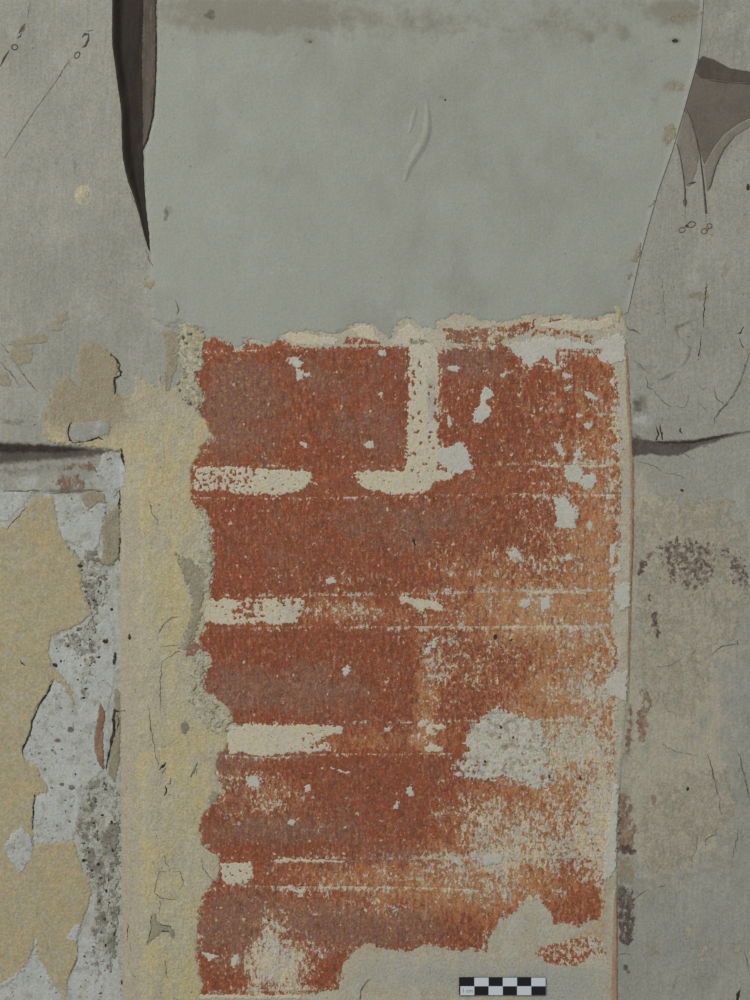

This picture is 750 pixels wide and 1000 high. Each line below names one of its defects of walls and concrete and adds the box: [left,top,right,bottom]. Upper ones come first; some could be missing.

peeling [8,311,68,366]
spalling [162,322,206,411]
crack [634,327,750,479]
crack [698,283,707,361]
peeling [0,491,32,522]
crack [67,422,124,464]
peeling [95,450,126,491]
spalling [174,508,233,736]
peeling [0,496,123,1000]
peeling [145,913,175,945]